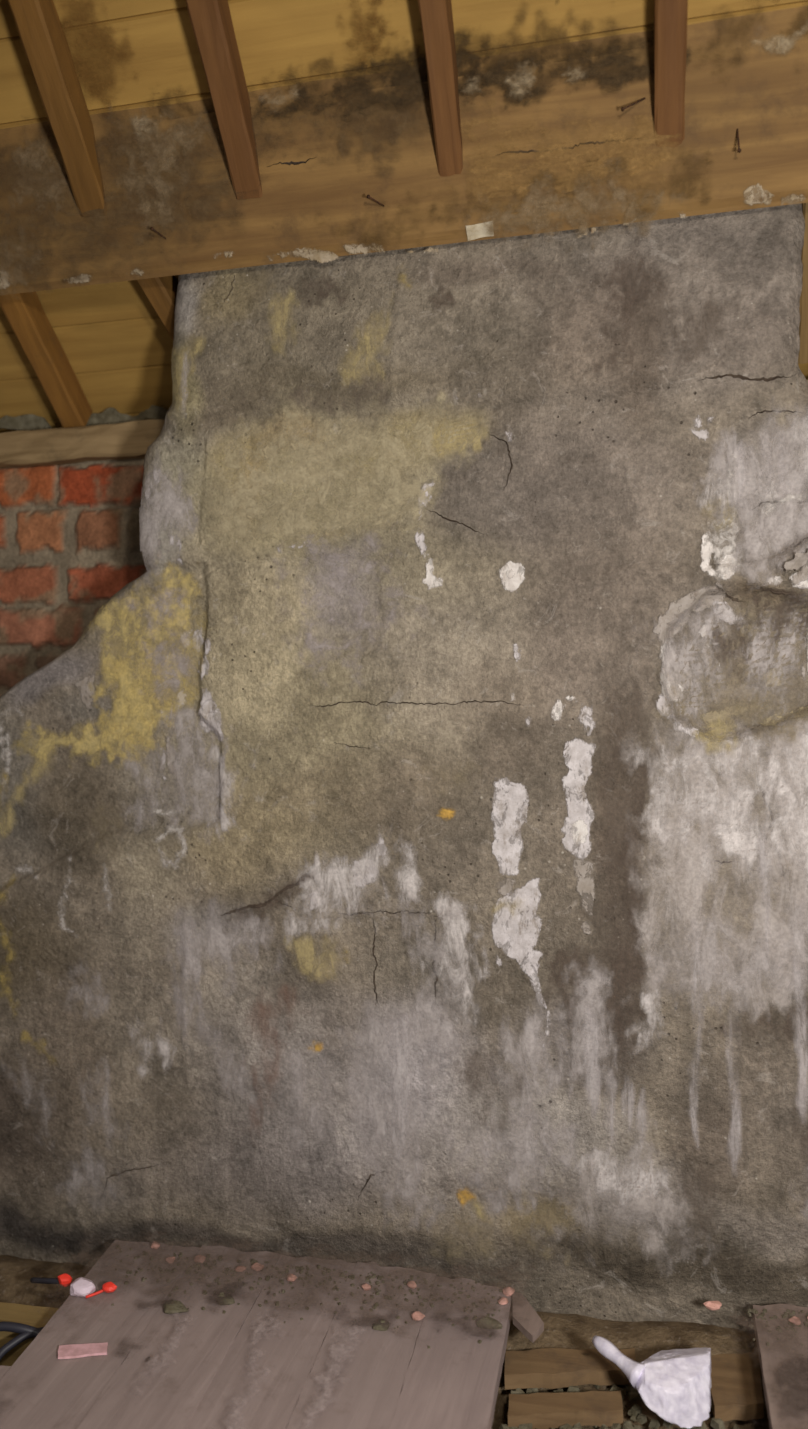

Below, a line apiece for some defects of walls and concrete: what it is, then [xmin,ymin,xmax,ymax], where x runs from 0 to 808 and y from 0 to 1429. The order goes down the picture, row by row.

damp [258,0,429,118]
damp [456,23,654,105]
crack [425,508,478,532]
peeling [500,561,525,592]
spalling [653,494,808,737]
flaking render [127,627,234,865]
crack [313,699,521,707]
peeling [552,696,596,934]
crack [221,870,311,918]
crack [338,910,438,1006]
damp [465,717,808,1252]
damp [349,997,460,1210]